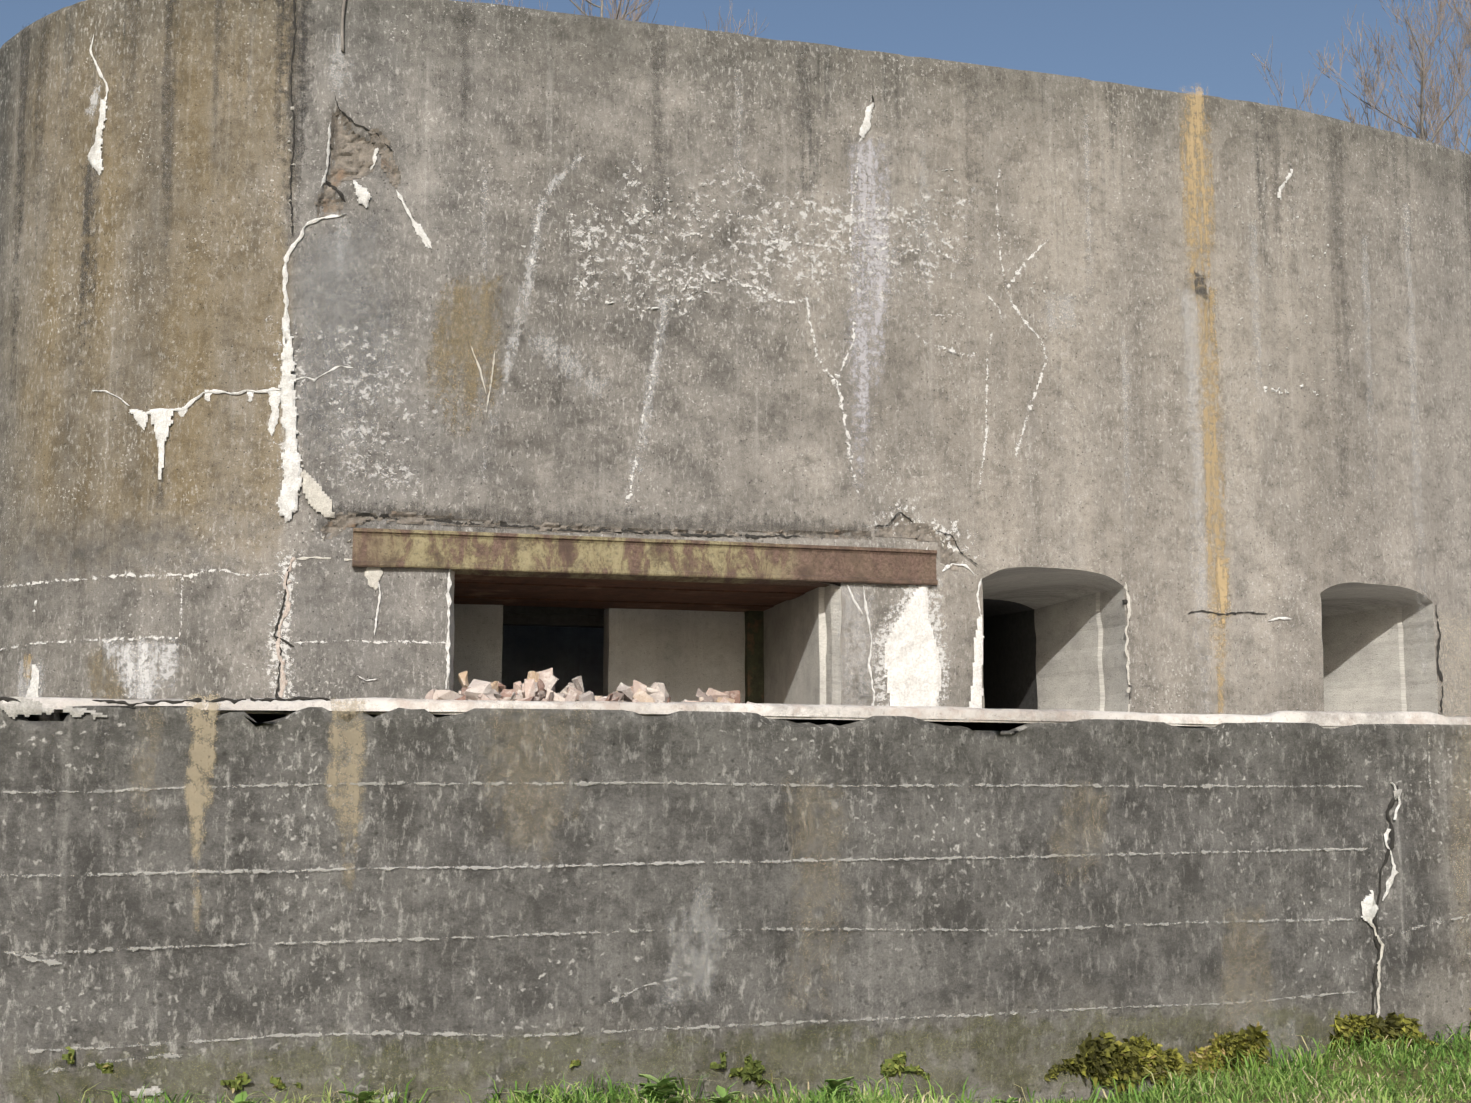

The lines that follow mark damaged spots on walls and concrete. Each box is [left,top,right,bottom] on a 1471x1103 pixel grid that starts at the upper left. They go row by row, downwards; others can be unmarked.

water stain [78,35,109,362]
crack [92,0,428,523]
spalling [315,97,432,248]
efflorescence [544,160,980,330]
crack [806,95,897,493]
crack [979,169,1080,488]
corrosion [1180,87,1230,714]
efflorescence [105,639,179,700]
water stain [184,694,220,856]
water stain [325,698,366,847]
flaking render [309,503,984,708]
crack [1361,732,1471,1018]